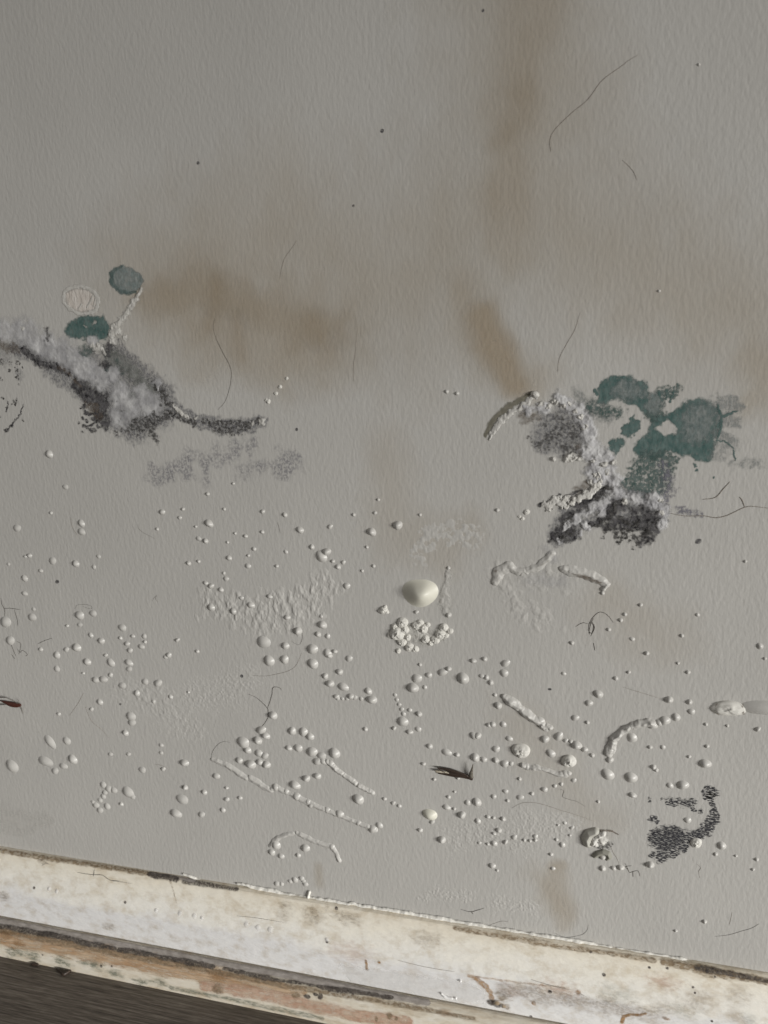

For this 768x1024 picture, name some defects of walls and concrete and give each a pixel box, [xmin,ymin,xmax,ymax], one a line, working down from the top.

damp [484,376,745,550]
damp [647,786,720,863]